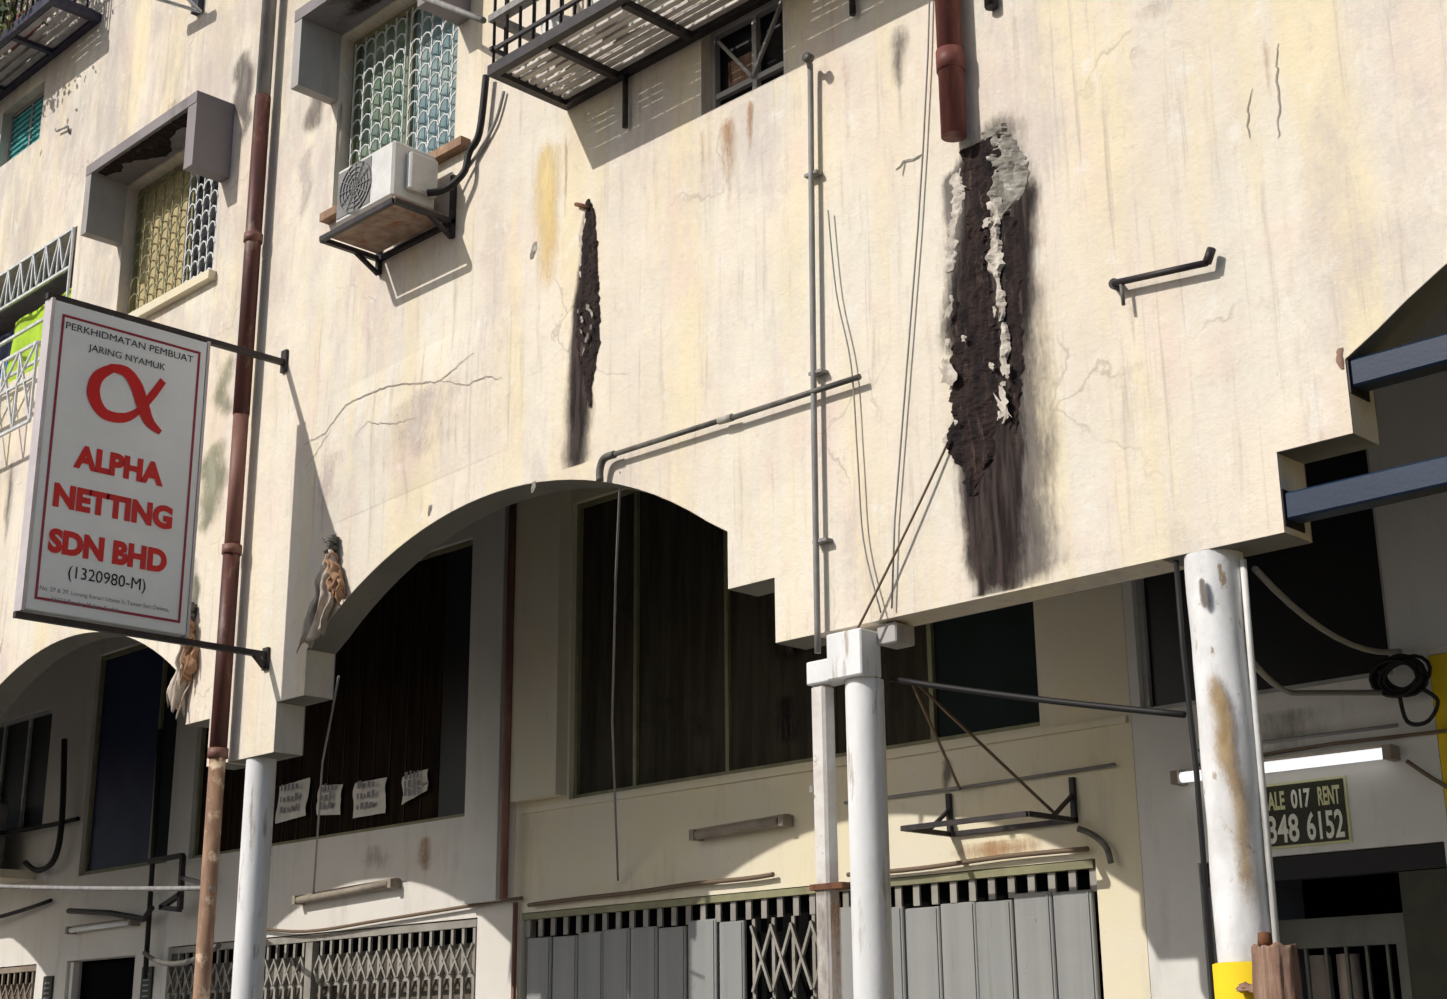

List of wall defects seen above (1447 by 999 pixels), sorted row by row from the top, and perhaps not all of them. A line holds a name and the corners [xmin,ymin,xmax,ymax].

water stain [538,145,566,268]